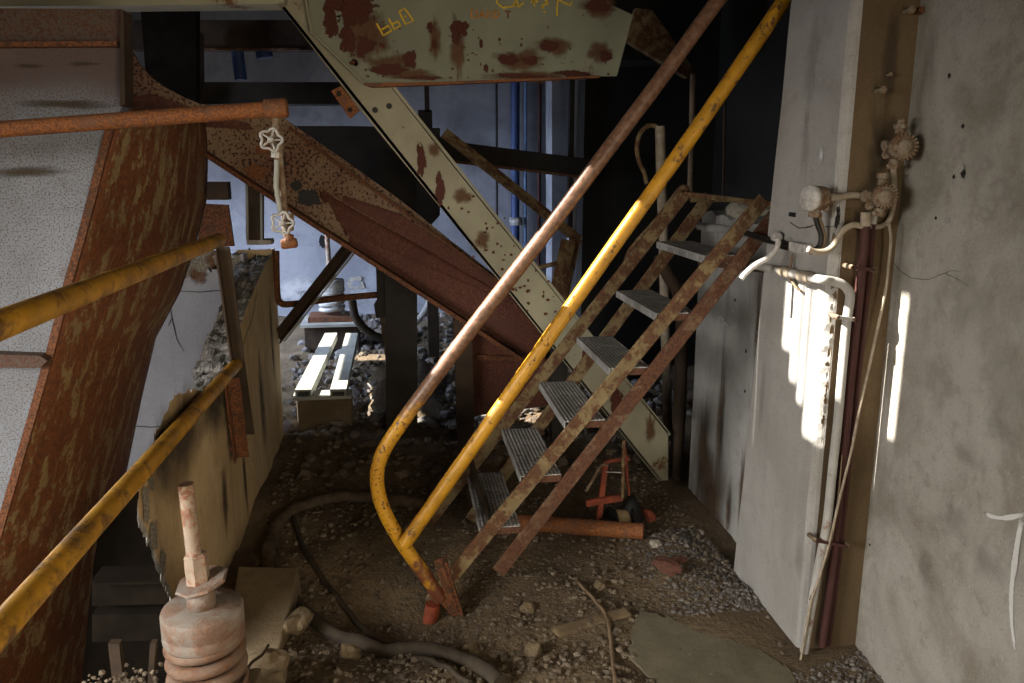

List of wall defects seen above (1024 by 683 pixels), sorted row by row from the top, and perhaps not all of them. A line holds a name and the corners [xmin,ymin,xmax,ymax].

corrosion [322,0,591,80]
corrosion [416,142,475,213]
corrosion [465,217,514,271]
corrosion [610,388,625,413]
corrosion [646,416,654,440]
corrosion [697,362,745,531]